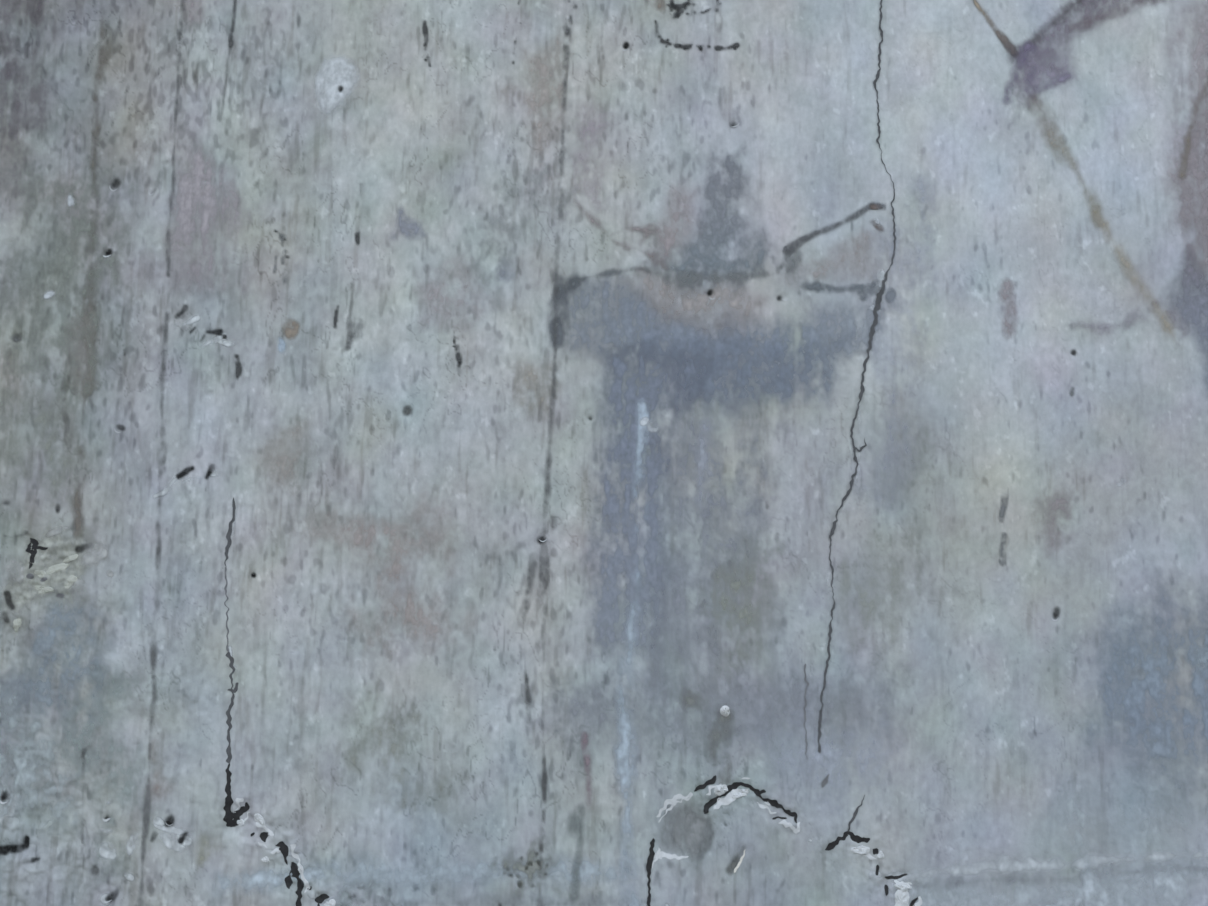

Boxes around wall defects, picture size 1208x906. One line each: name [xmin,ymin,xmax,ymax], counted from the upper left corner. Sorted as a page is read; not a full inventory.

crack [803,0,896,788]
crack [223,497,336,906]
spalling [654,792,711,860]
spalling [727,850,745,873]
crack [646,775,922,906]